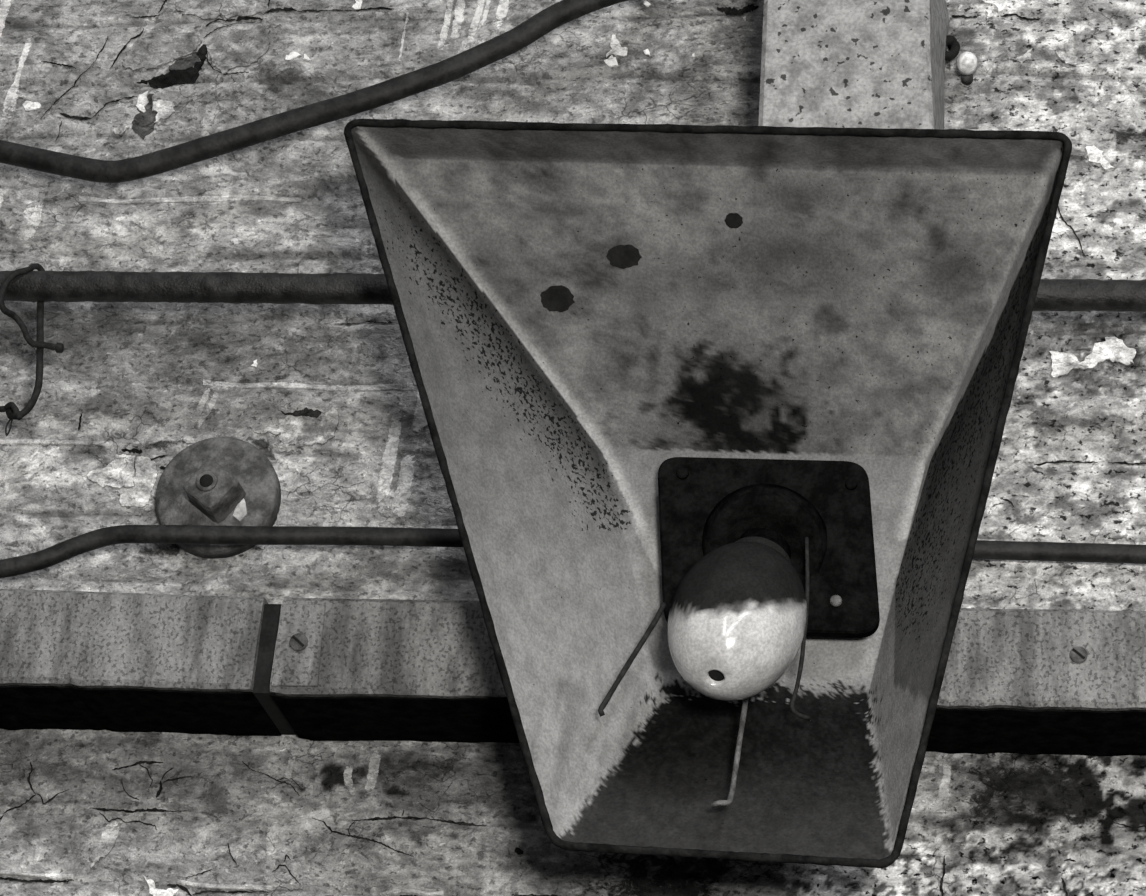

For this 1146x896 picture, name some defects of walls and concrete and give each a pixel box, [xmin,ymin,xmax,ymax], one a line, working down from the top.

crack [40,0,167,140]
spalling [113,44,207,140]
crack [204,0,394,75]
peeling [1049,337,1136,378]
crack [0,762,69,819]
crack [93,761,191,830]
crack [242,761,414,857]
damp [935,759,951,817]
damp [967,760,1100,826]
crack [167,843,301,896]
damp [575,853,785,896]